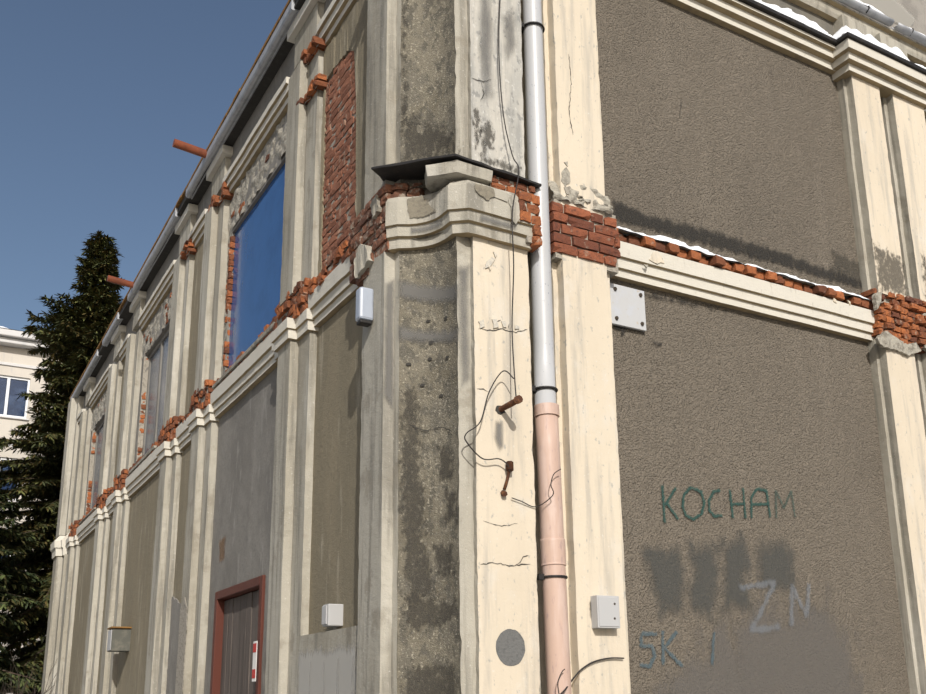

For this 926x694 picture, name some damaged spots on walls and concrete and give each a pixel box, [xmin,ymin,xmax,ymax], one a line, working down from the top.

water stain [398,0,460,161]
spalling [68,390,128,537]
spalling [136,293,172,461]
spalling [158,416,179,446]
flaking render [190,116,287,415]
peeling [273,0,436,331]
water stain [386,269,467,403]
water stain [398,387,458,631]
crack [480,555,528,566]
spalling [475,161,621,278]
spalling [861,288,926,357]
water stain [407,663,457,694]